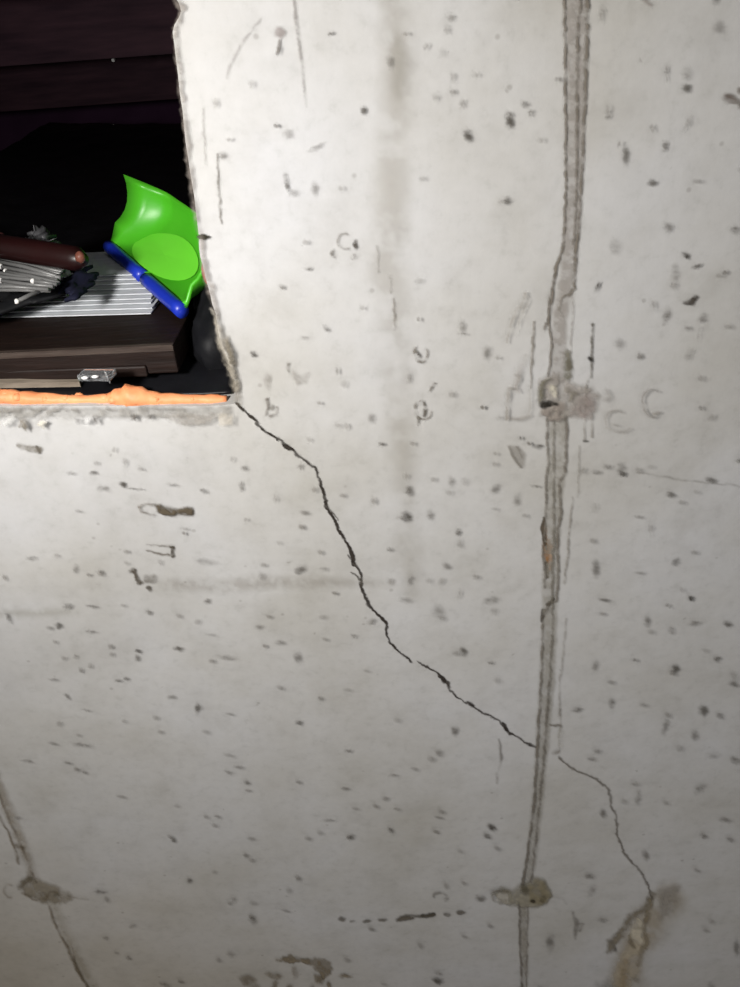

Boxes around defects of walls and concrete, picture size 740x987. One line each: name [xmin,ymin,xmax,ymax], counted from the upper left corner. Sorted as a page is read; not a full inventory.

crack [235,402,535,747]
crack [559,758,652,897]
damp [608,892,673,987]